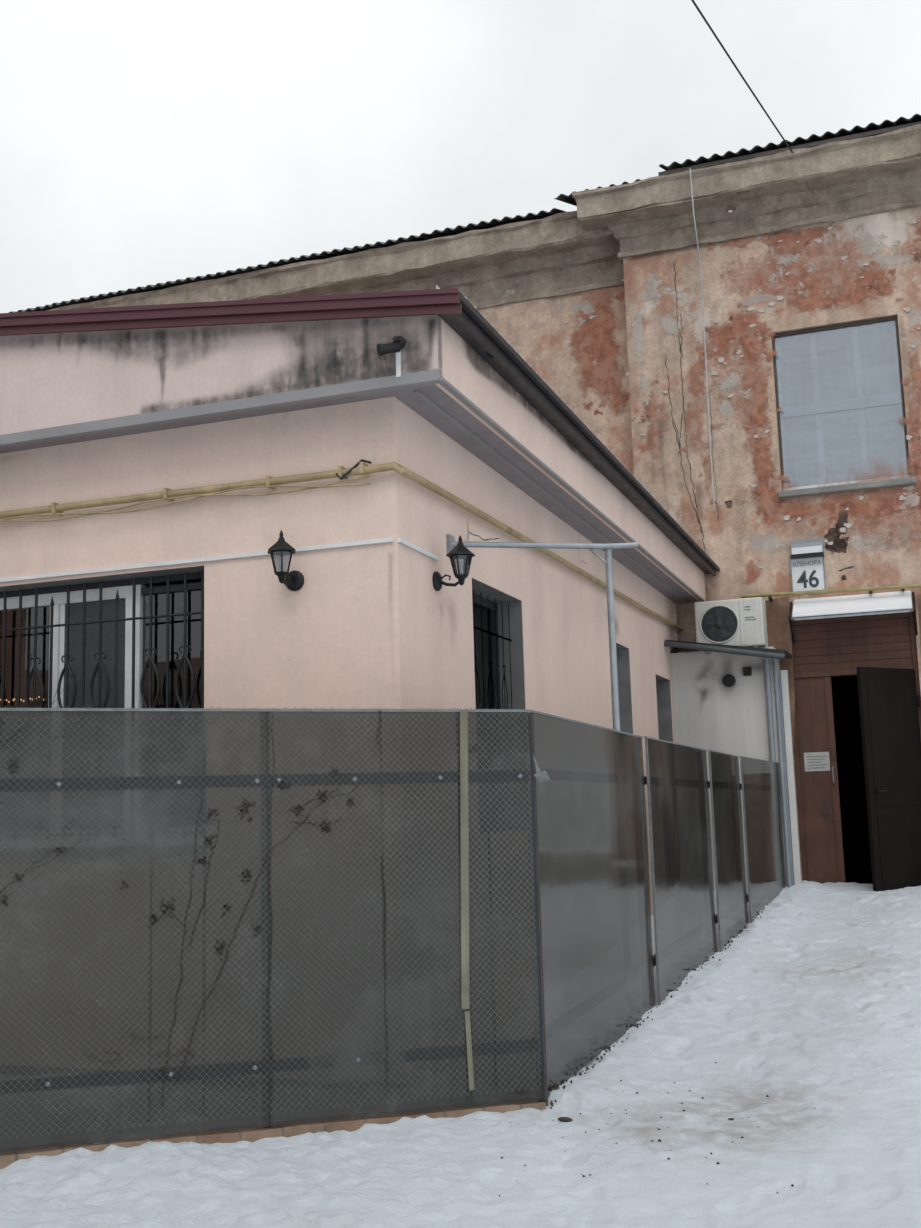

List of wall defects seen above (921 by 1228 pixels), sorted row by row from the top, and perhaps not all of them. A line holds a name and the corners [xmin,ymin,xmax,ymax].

damp [298,343,417,381]
peeling [556,219,921,584]